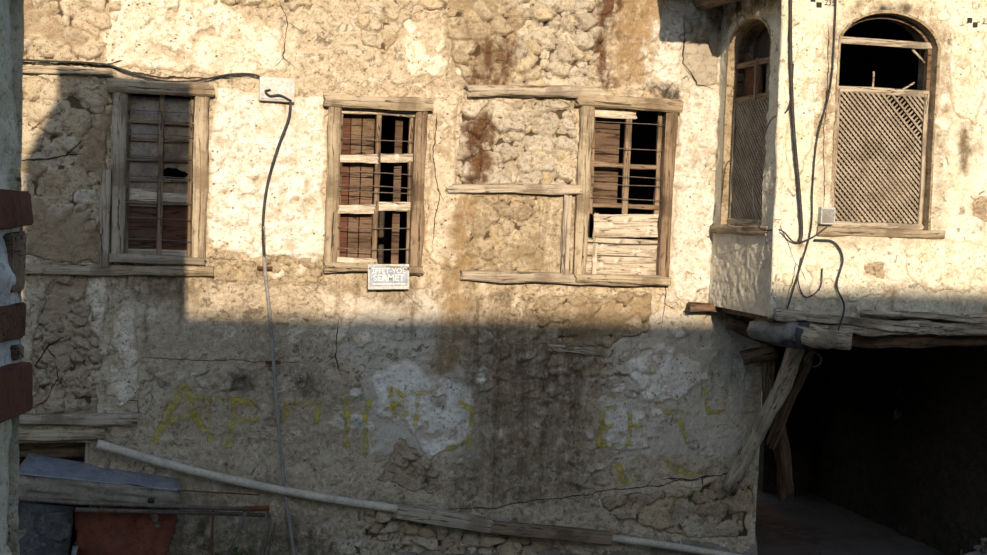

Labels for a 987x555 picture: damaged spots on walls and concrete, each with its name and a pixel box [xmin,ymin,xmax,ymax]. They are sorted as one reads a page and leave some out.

corrosion [596,0,623,88]
peeling [23,0,378,348]
corrosion [462,112,495,184]
spalling [356,0,615,295]
spalling [21,76,141,414]
damp [436,198,475,372]
crack [33,337,68,408]
peeling [347,360,487,494]
crack [441,471,750,509]
spalling [602,474,757,538]